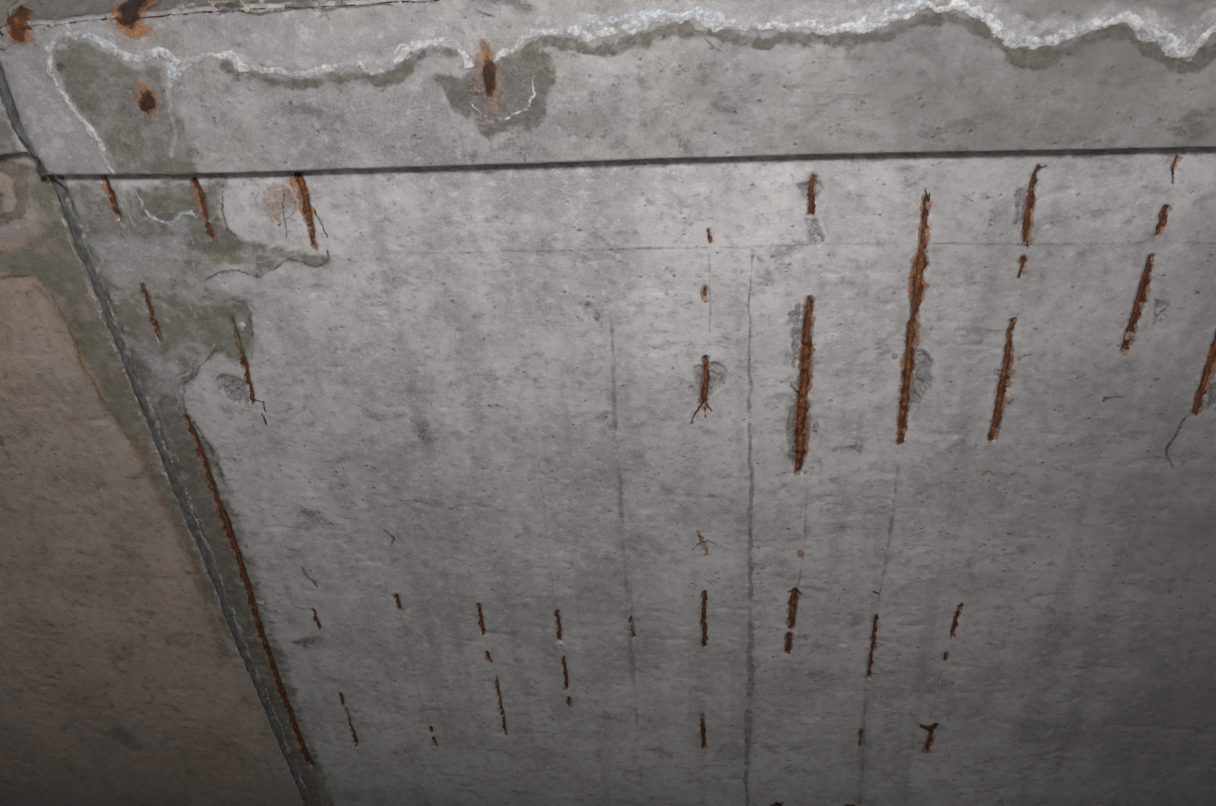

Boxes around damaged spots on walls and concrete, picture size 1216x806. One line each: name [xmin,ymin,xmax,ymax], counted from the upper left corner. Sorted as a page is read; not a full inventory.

rust [109,0,157,40]
leakage [493,0,1216,73]
rust [290,172,328,250]
rust [801,174,824,242]
rust [1014,165,1047,278]
rust [892,188,931,445]
rust [1121,255,1167,355]
rust [690,355,725,425]
rust [787,296,819,474]
rust [988,317,1017,444]
rust [1192,334,1216,416]
rust [182,415,316,769]